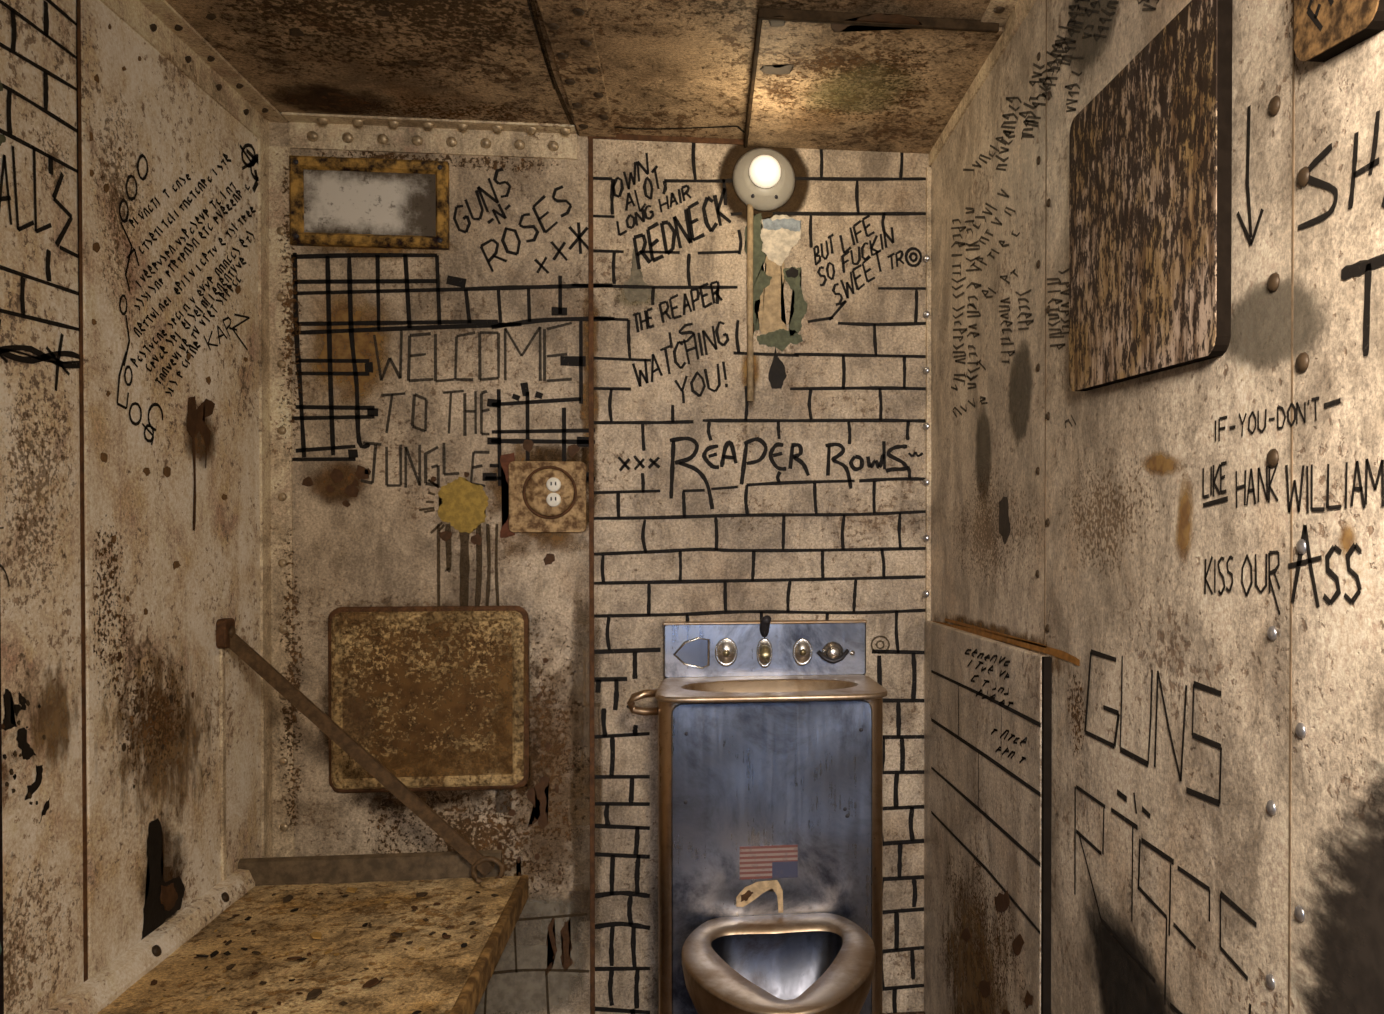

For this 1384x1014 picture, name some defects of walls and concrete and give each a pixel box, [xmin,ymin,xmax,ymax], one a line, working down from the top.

peeling [744,213,808,352]
corrosion [1341,527,1354,552]
corrosion [280,530,304,835]
spalling [1,688,50,822]
corrosion [321,600,602,973]